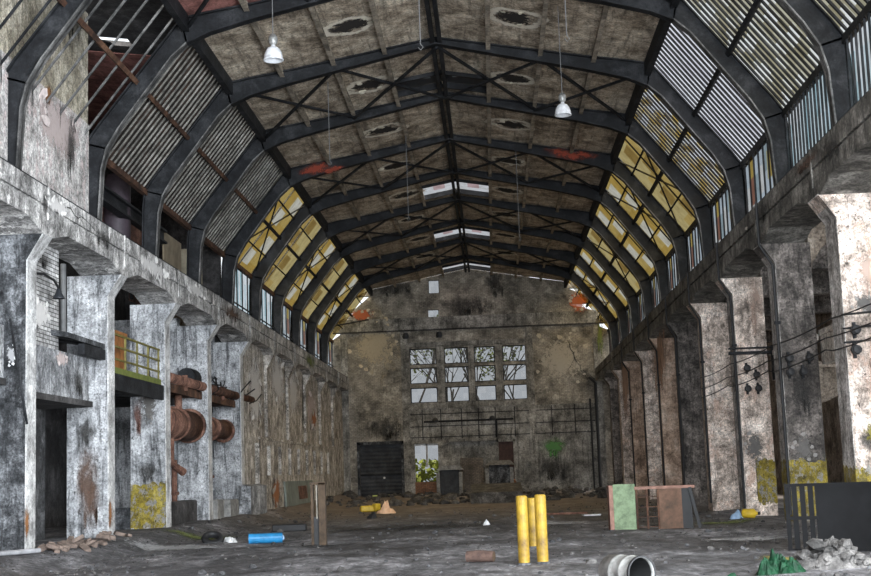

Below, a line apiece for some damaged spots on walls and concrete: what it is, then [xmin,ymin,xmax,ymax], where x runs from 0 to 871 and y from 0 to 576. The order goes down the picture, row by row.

corrosion [77,451,99,526]